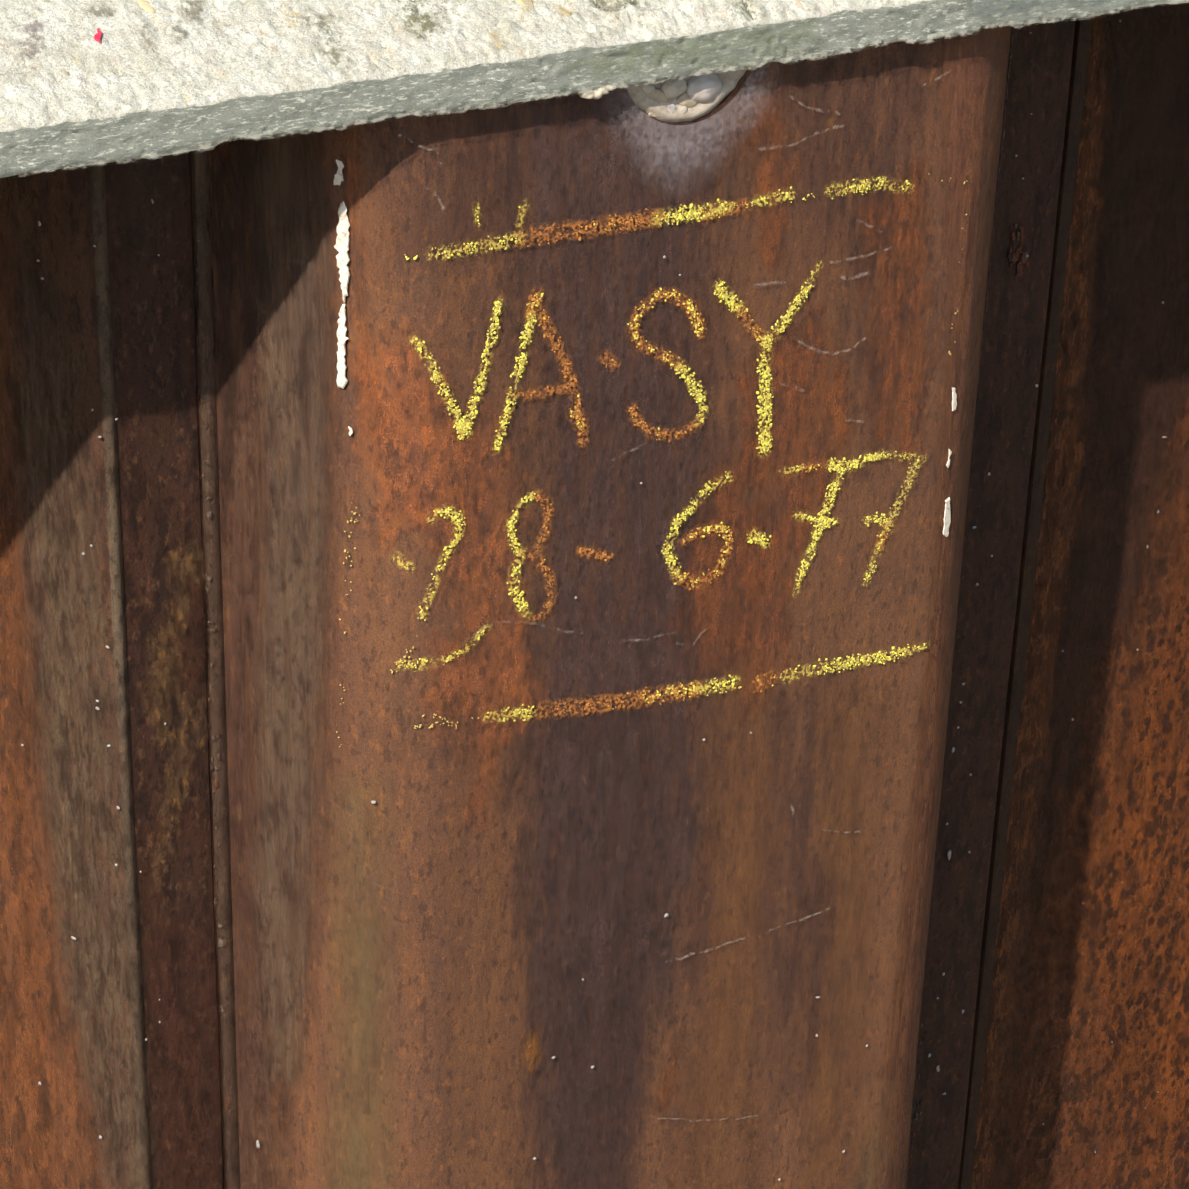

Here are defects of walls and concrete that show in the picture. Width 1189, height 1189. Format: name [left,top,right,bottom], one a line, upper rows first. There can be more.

leakage [355,103,497,124]
corrosion [750,103,790,264]
leakage [749,40,881,69]
corrosion [863,164,928,462]
corrosion [0,270,94,1189]
corrosion [145,543,209,874]
corrosion [355,346,531,746]
leakage [506,83,731,1189]
corrosion [678,315,847,721]
corrosion [877,33,986,1189]
corrosion [1000,475,1189,1189]